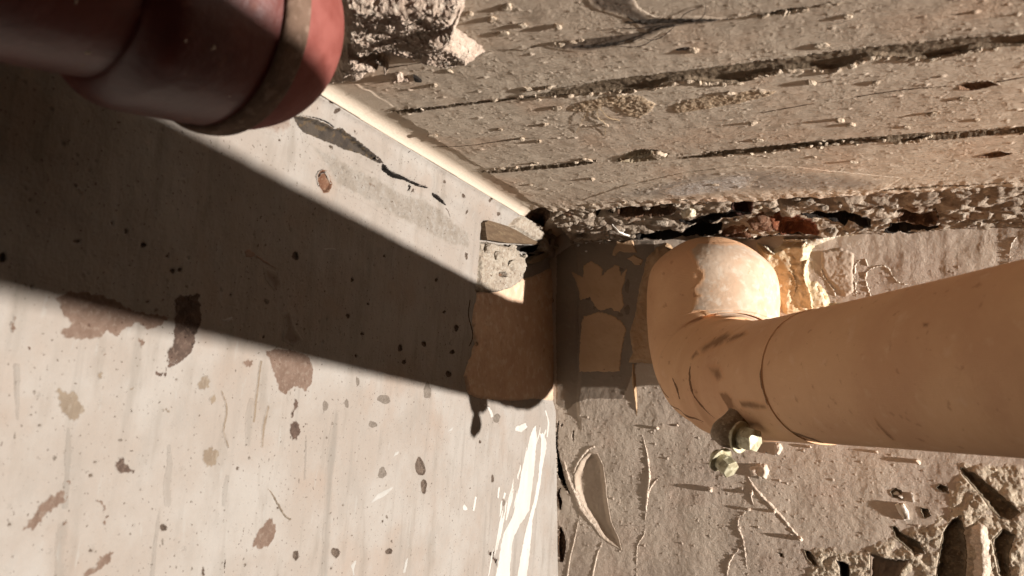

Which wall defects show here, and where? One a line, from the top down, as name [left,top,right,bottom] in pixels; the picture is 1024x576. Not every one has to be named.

crack [293,115,450,216]
peeling [572,240,643,372]
leakage [244,360,269,448]
leakage [321,410,339,576]
spalling [803,462,1024,576]